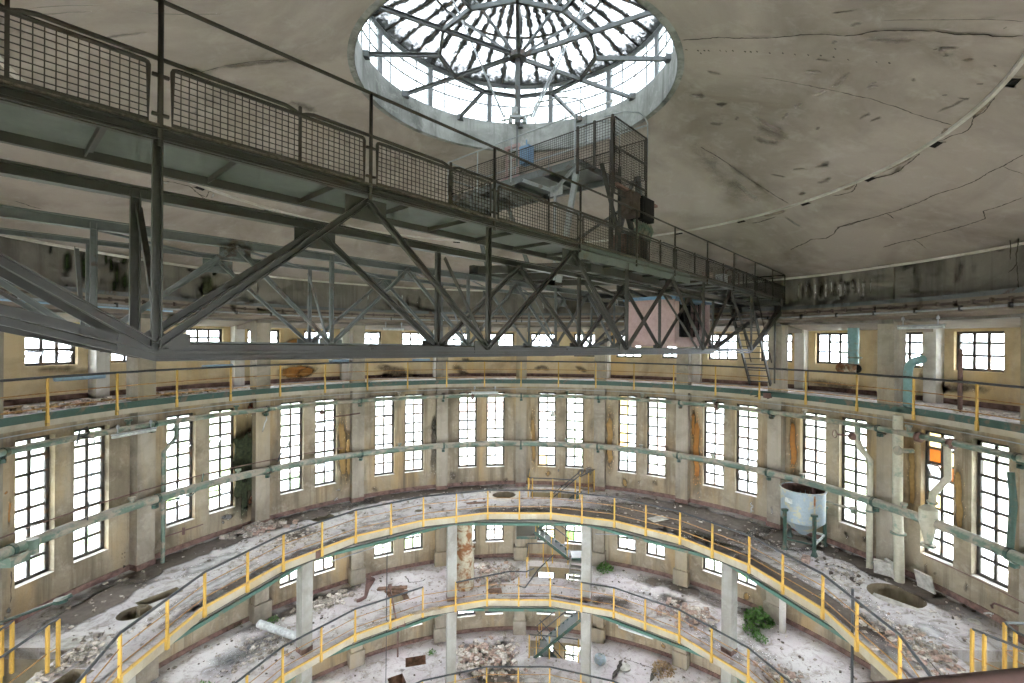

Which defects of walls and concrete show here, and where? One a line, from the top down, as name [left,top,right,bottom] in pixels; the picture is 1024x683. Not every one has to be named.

crack [685,19,1023,40]
crack [768,78,1018,140]
crack [701,147,786,223]
crack [791,154,1023,250]
damp [232,423,252,515]
rust [338,419,350,479]
rust [691,412,700,484]
rust [789,420,797,468]